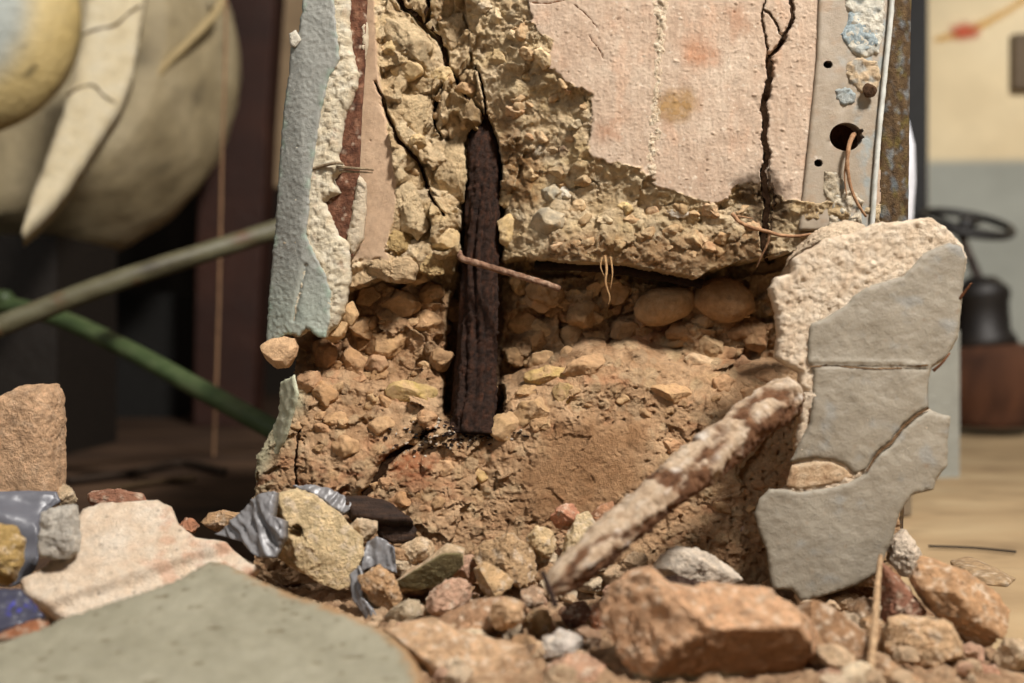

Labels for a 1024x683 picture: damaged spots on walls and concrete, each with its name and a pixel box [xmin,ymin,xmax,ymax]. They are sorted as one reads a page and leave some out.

crack [375,83,445,217]
crack [399,0,492,136]
crack [760,0,795,261]
spalling [252,0,885,555]
spalling [253,554,318,586]
spalling [614,417,853,586]
spalling [856,552,901,587]